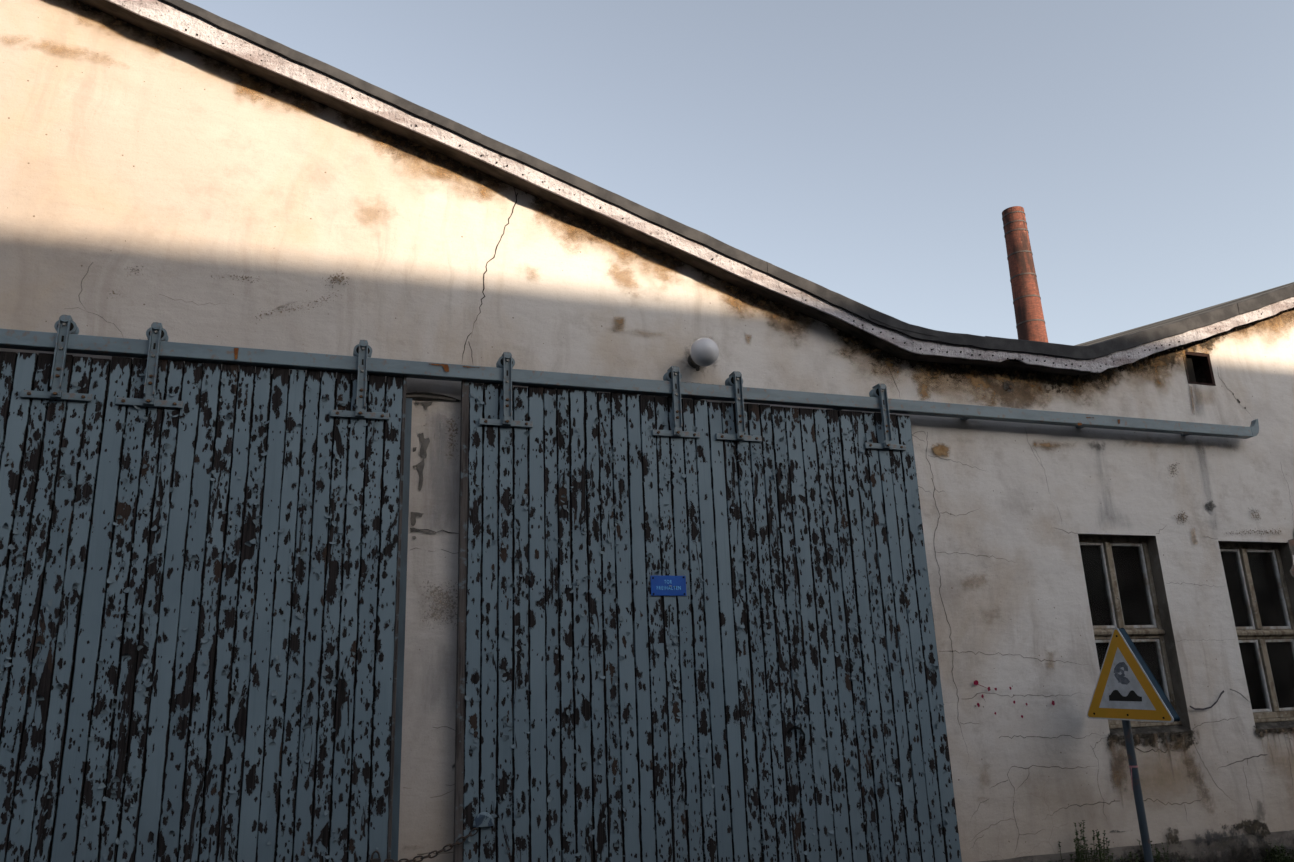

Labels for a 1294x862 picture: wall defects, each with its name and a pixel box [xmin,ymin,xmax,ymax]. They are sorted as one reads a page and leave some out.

crack [462,188,518,362]
leakage [525,191,682,286]
leakage [697,268,810,330]
leakage [828,307,1294,409]
peeling [560,573,630,743]
crack [913,431,1294,849]
leakage [1107,730,1207,794]
leakage [1166,820,1271,845]